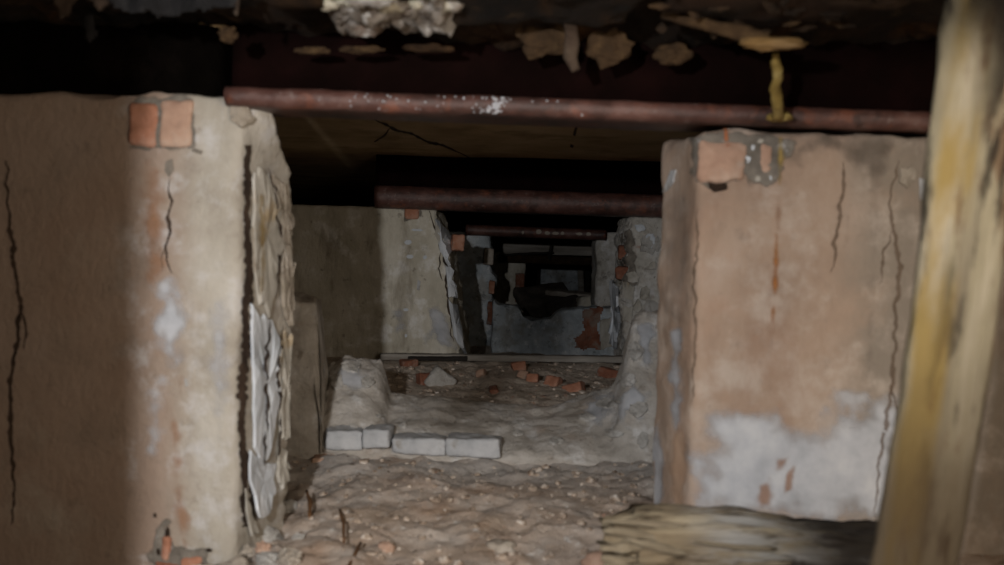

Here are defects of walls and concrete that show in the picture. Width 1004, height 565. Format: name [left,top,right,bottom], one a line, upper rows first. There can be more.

flaking render [128,94,203,177]
flaking render [690,130,796,192]
crack [161,179,173,273]
crack [830,162,845,273]
crack [4,161,28,525]
flaking render [244,167,296,536]
damp [329,362,375,390]
damp [578,323,654,438]
damp [637,329,896,520]
crack [874,162,903,517]
flaking render [148,513,212,565]